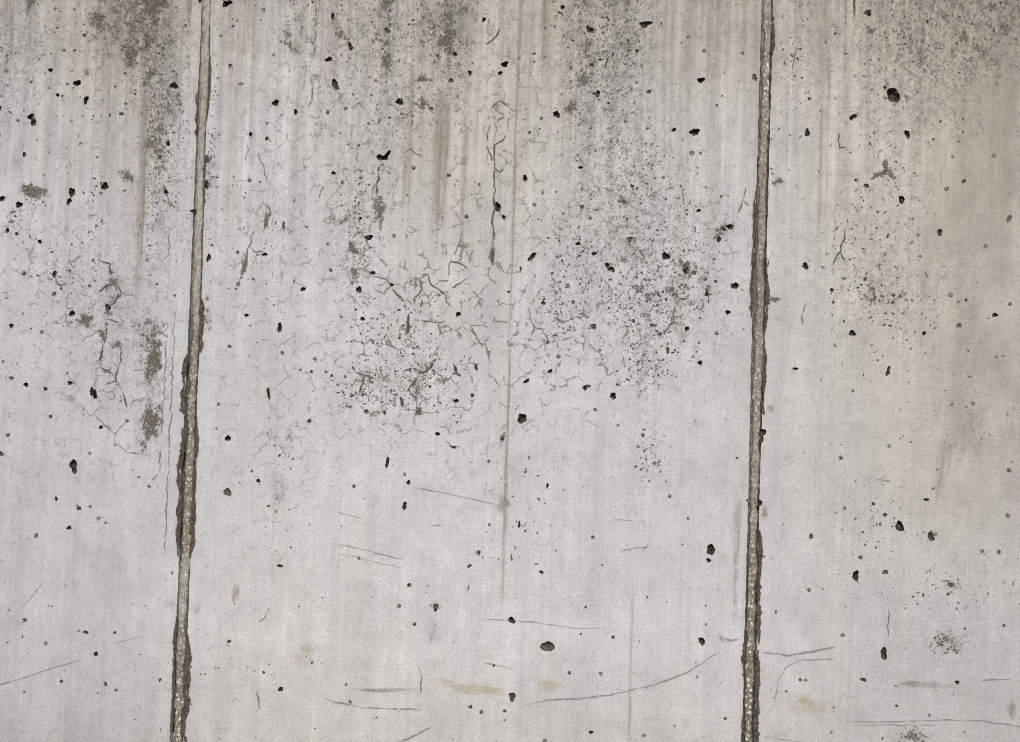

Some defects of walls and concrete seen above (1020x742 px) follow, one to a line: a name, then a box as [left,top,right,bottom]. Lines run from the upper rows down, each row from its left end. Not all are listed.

crack [486,97,509,264]
crack [95,261,177,550]
crack [358,231,468,334]
crack [391,324,485,406]